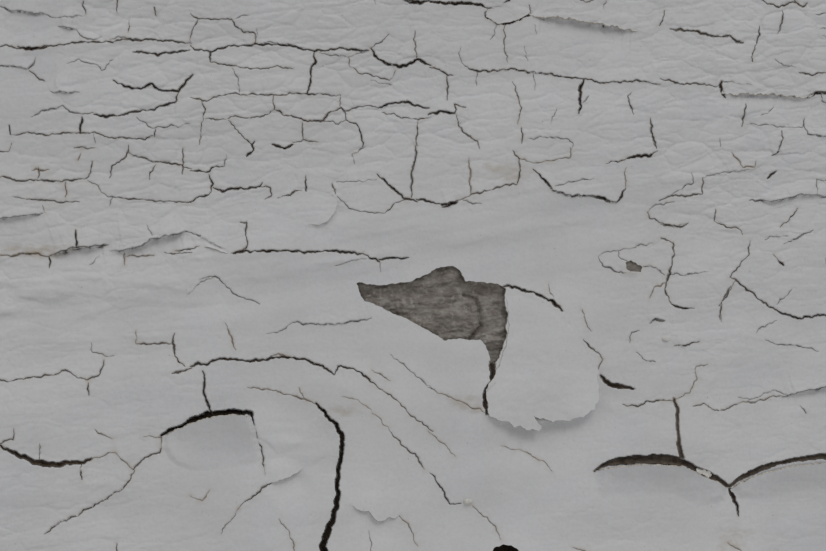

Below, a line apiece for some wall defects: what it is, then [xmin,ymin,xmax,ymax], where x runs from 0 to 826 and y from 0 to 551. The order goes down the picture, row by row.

crack [0,0,735,219]
crack [660,0,824,62]
crack [775,59,826,103]
crack [8,222,409,270]
crack [599,95,826,362]
crack [0,327,453,551]
crack [347,397,500,537]
crack [390,354,495,414]
peeling [357,266,599,431]
crack [503,284,826,516]